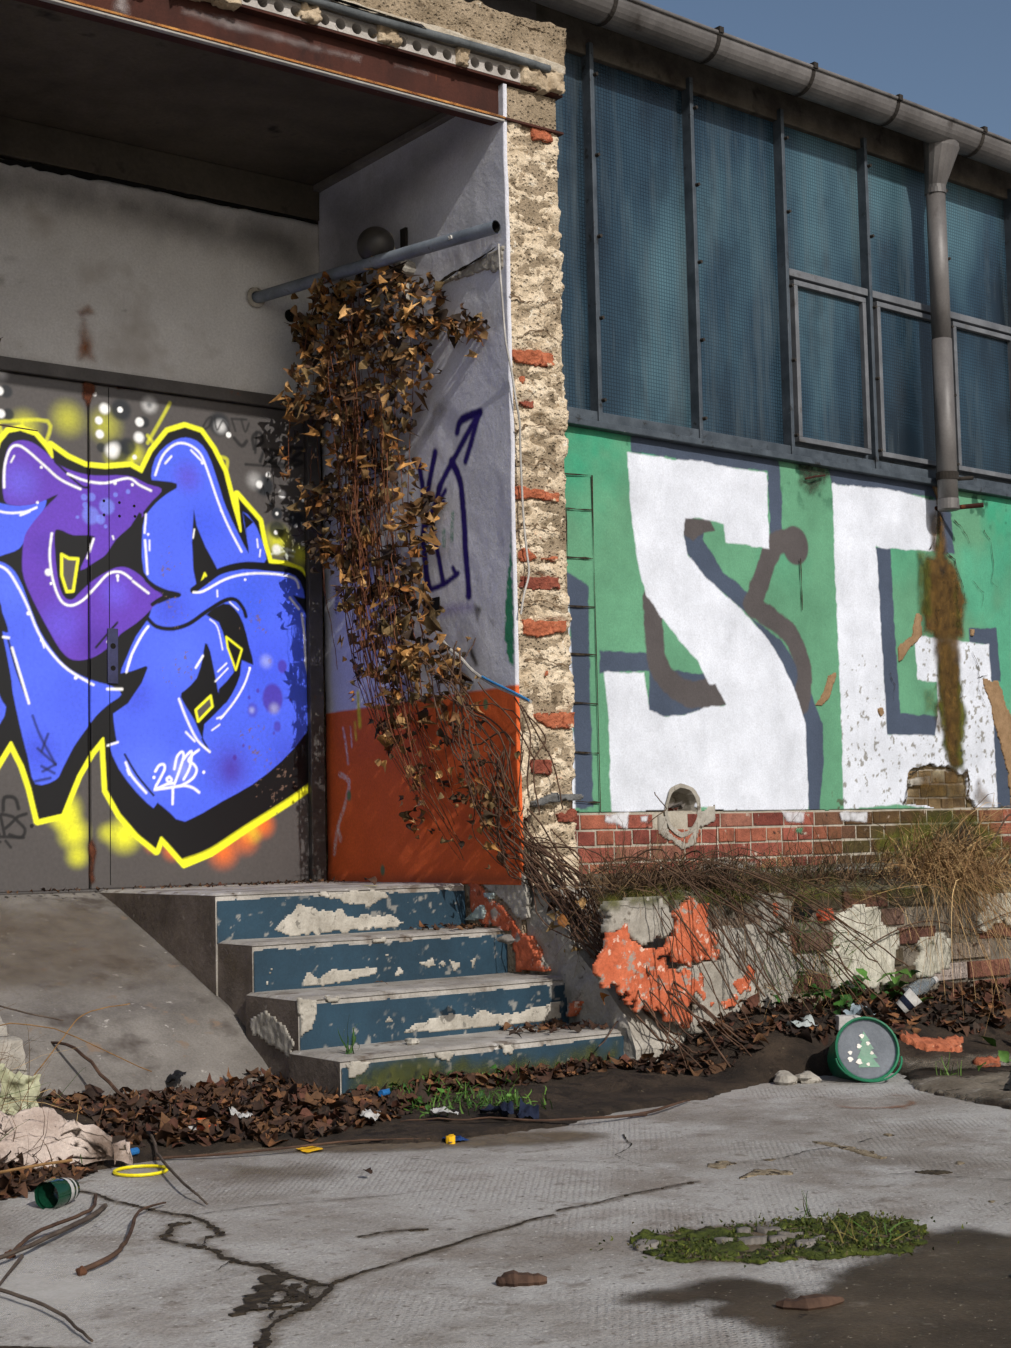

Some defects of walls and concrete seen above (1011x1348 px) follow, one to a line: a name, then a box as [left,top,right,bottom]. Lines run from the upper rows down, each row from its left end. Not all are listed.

corrosion [149,22,232,45]
corrosion [357,77,488,113]
flaking render [512,349,555,384]
peeling [898,613,923,661]
peeling [983,678,1011,808]
spalling [906,757,972,809]
peeling [974,891,1011,933]
peeling [250,889,404,1058]
peeling [385,873,952,1062]
spalling [345,1060,370,1078]
crack [80,1134,696,1348]
crack [0,1340,51,1348]